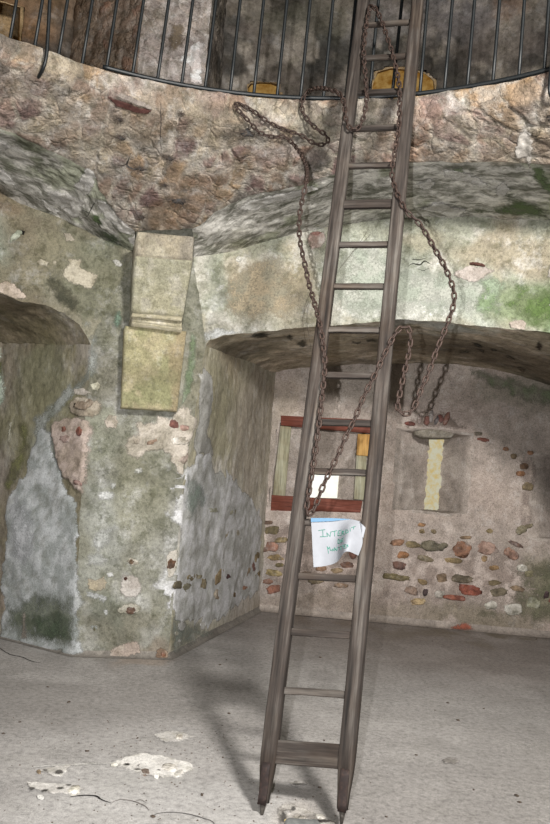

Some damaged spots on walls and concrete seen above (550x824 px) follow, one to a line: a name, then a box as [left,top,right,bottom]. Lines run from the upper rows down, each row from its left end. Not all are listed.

peeling [0,382,118,655]
peeling [125,368,289,642]
spalling [88,558,141,614]
spalling [299,526,358,591]
spalling [27,753,193,800]
crack [70,795,214,823]